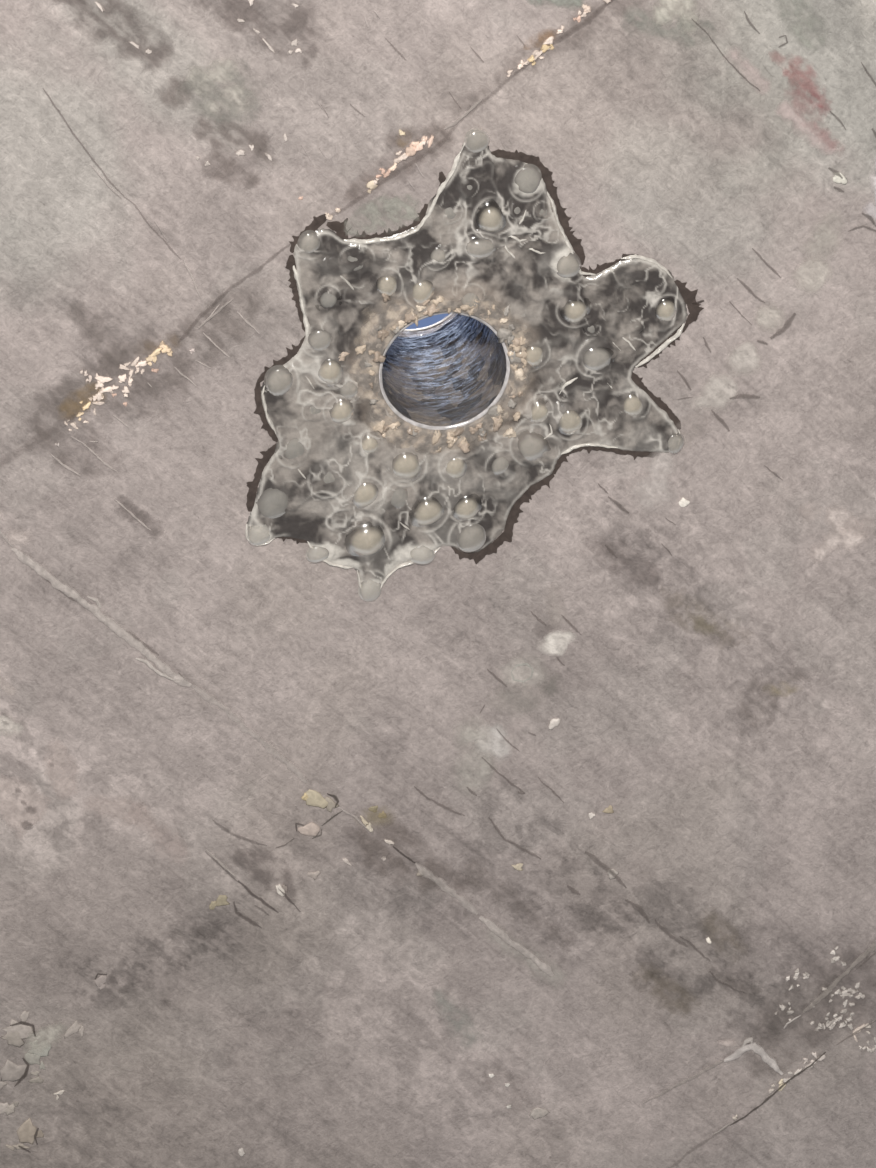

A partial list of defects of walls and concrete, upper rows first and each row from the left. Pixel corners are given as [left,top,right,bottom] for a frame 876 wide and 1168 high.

spalling [506,4,591,77]
spalling [366,129,434,194]
crack [729,278,796,344]
spalling [64,341,173,431]
water stain [245,128,704,602]
water stain [697,343,759,407]
water stain [544,632,572,654]
water stain [462,727,508,786]
crack [276,793,343,848]
crack [206,849,301,927]
peeling [0,1011,84,1115]
crack [713,1052,826,1135]